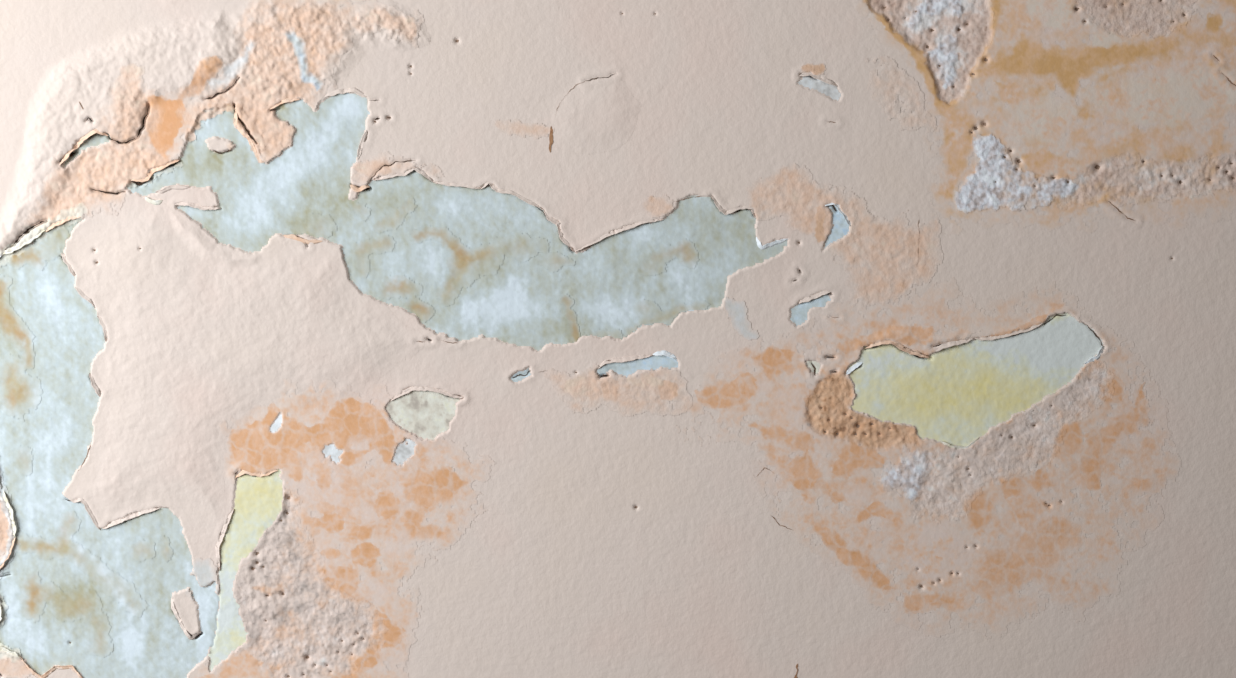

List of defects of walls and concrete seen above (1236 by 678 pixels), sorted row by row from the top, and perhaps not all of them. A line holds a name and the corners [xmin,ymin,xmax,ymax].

peeling [0,202,389,678]
leakage [218,378,496,678]
leakage [351,151,444,184]
peeling [386,386,464,465]
peeling [126,88,788,351]
peeling [597,350,678,377]
leakage [544,0,1236,640]
peeling [804,313,1115,525]
leakage [189,641,291,678]